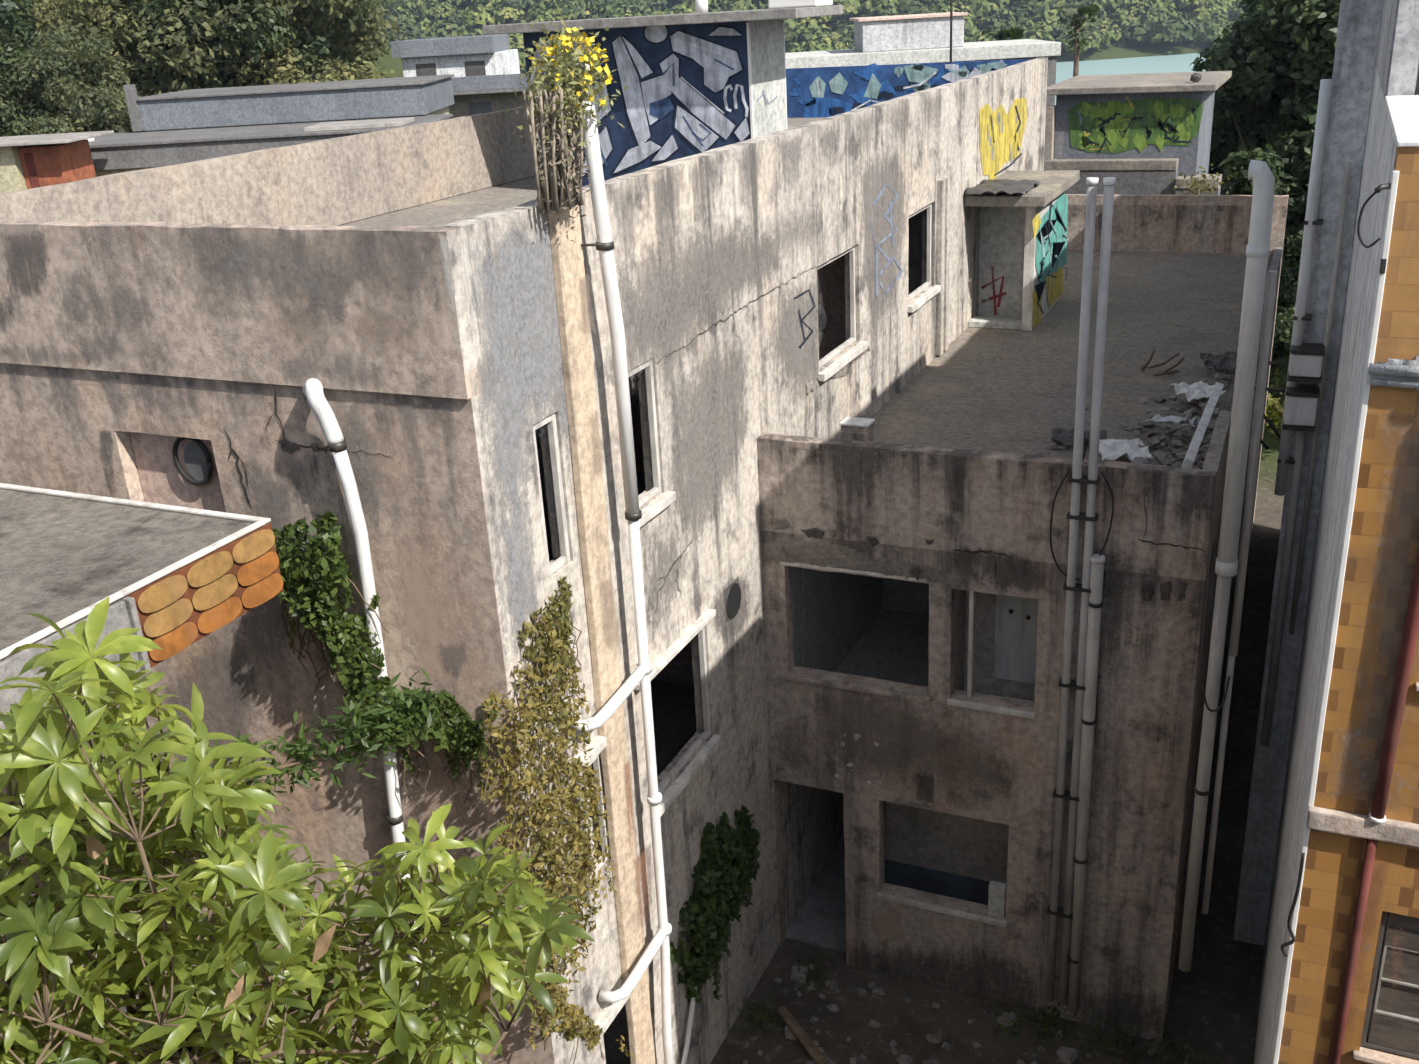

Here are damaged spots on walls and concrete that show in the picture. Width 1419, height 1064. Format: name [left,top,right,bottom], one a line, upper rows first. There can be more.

water stain [439,236,481,339]
crack [266,385,393,461]
crack [224,429,252,509]
water stain [850,947,1037,1011]